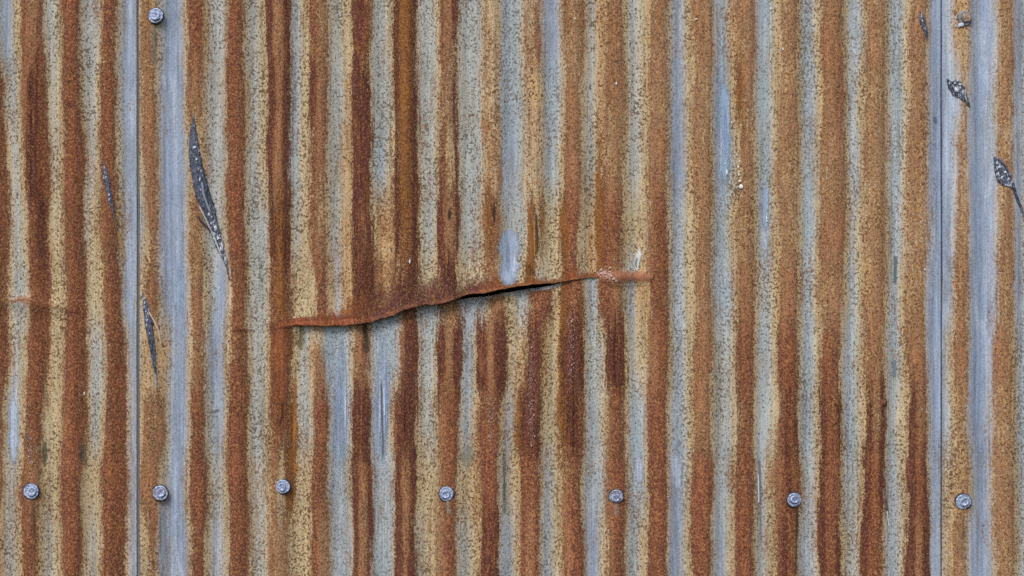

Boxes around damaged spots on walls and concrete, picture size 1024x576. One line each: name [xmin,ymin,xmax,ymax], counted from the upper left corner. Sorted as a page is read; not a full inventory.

rust [0,0,176,576]
rust [180,0,946,576]
rust [942,0,1024,576]